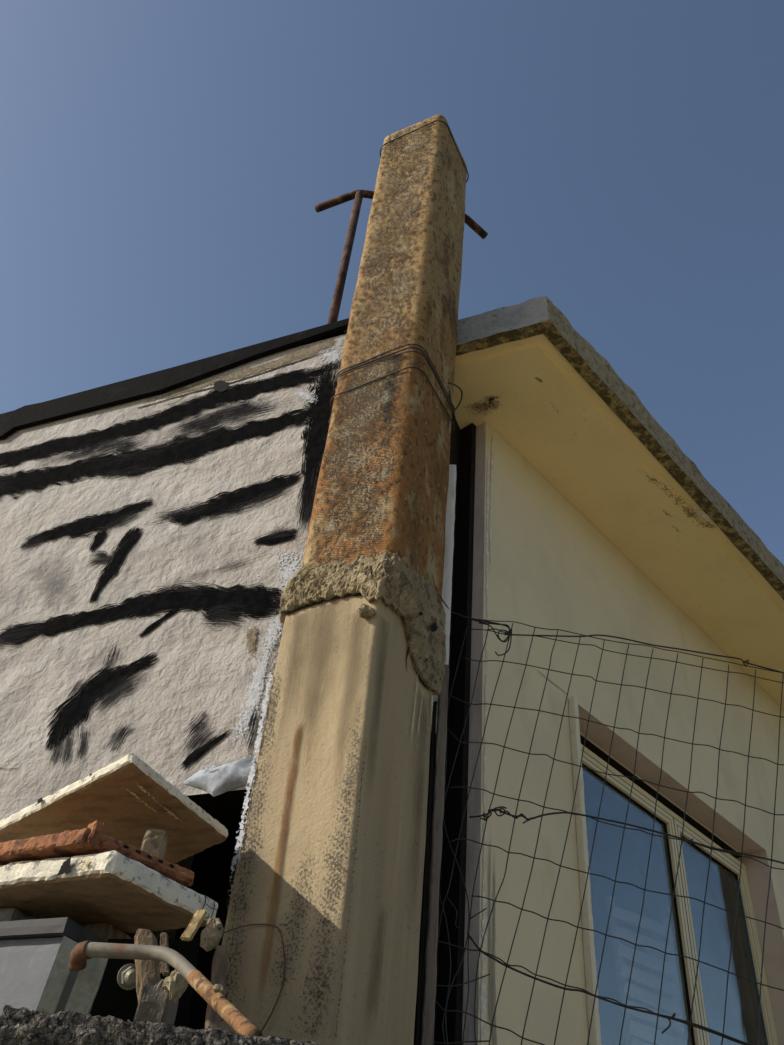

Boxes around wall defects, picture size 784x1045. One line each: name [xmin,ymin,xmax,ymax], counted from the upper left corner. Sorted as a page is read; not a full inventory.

corrosion [275,727,301,885]